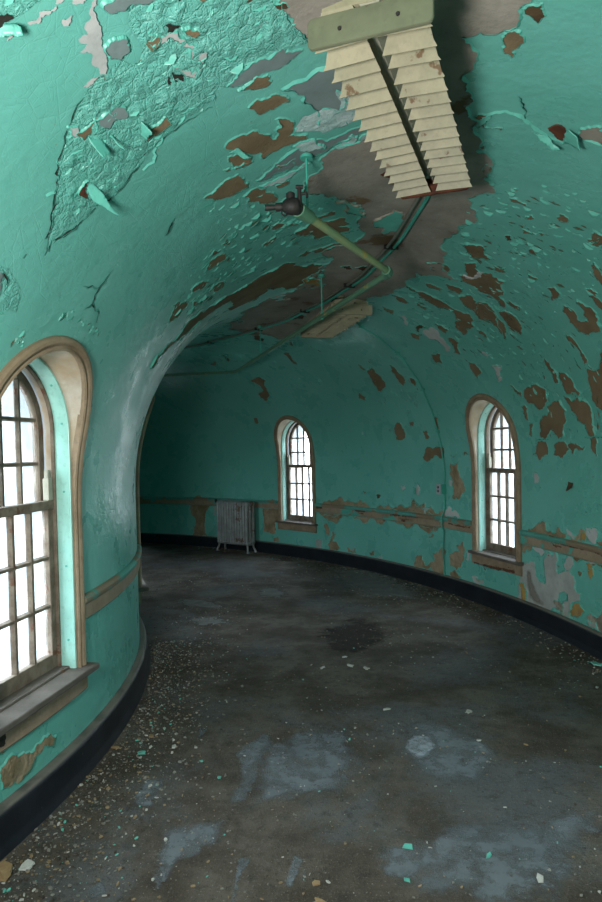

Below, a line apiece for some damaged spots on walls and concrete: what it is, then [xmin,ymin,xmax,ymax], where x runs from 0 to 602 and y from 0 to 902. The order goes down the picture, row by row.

peeling [0,0,157,87]
peeling [76,179,118,215]
peeling [66,105,129,158]
crack [23,75,211,259]
flaking render [141,0,602,461]
peeling [315,416,468,554]
peeling [414,541,484,586]
flaking render [518,544,602,633]
peeling [528,520,602,547]
peeling [0,732,57,791]